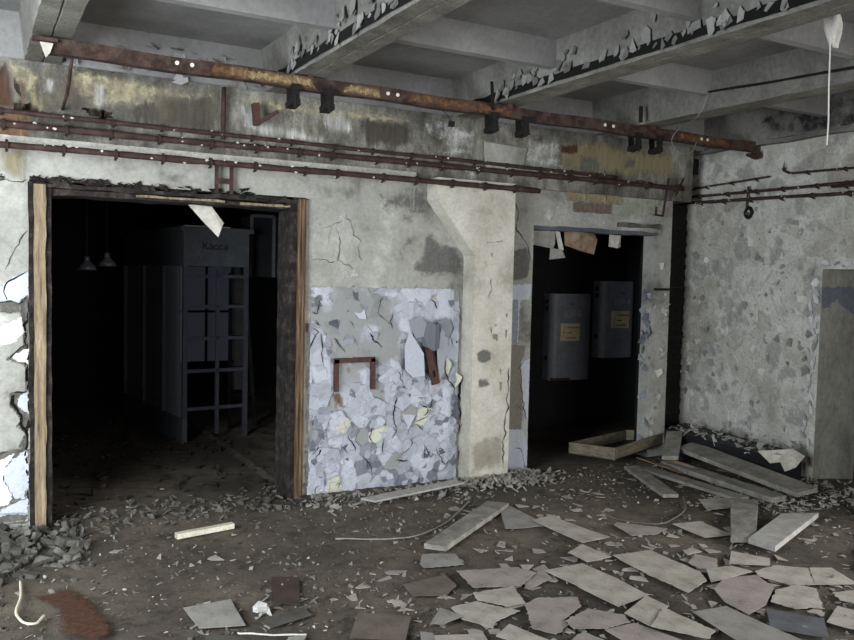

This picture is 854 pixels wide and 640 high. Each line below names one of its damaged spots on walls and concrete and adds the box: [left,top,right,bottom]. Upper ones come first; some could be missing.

peeling [0,295,30,526]
crack [312,213,361,269]
peeling [307,285,462,495]
flaking render [566,192,622,214]
peeling [683,216,854,473]
leakage [792,98,854,131]